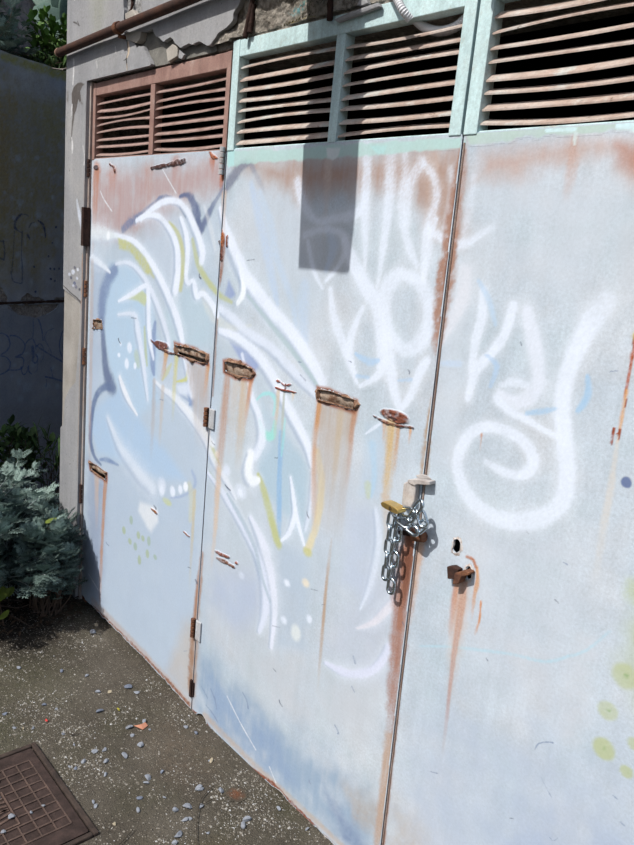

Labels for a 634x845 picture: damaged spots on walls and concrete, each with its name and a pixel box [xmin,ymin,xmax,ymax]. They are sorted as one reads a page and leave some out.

spalling [125,0,387,67]
peeling [0,265,80,426]
corrosion [87,257,215,732]
corrosion [149,317,258,627]
corrosion [273,379,297,456]
corrosion [239,158,357,214]
corrosion [309,383,361,694]
corrosion [371,394,436,845]
corrosion [440,553,483,758]
corrosion [429,131,634,357]
corrosion [590,329,634,586]
corrosion [250,765,336,845]